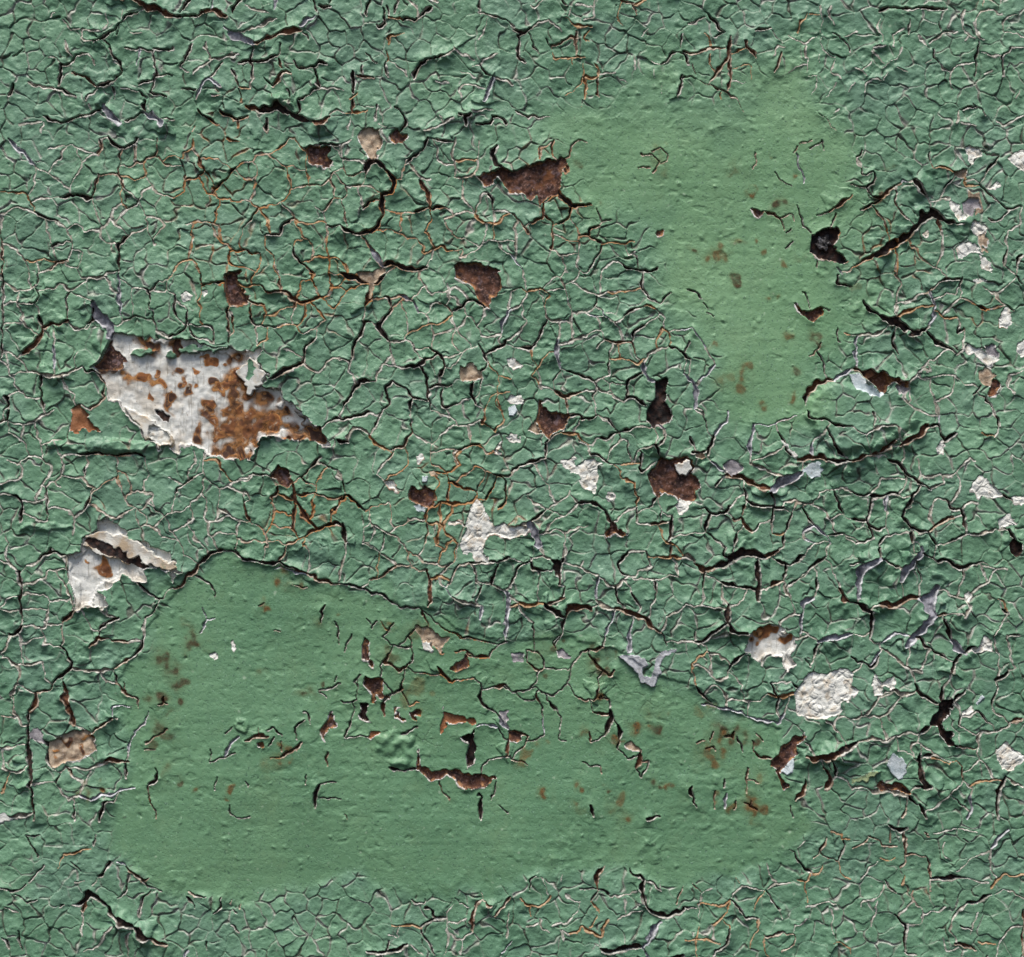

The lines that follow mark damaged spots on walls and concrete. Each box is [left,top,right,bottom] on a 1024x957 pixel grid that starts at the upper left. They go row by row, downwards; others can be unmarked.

crack [18,0,386,134]
crack [384,33,514,102]
crack [477,0,1024,187]
peeling [91,333,331,461]
crack [0,107,1024,823]
peeling [675,453,705,476]
peeling [68,517,181,612]
peeling [448,499,533,565]
peeling [744,624,797,673]
peeling [794,668,858,720]
crack [58,834,168,957]
crack [366,824,1024,957]